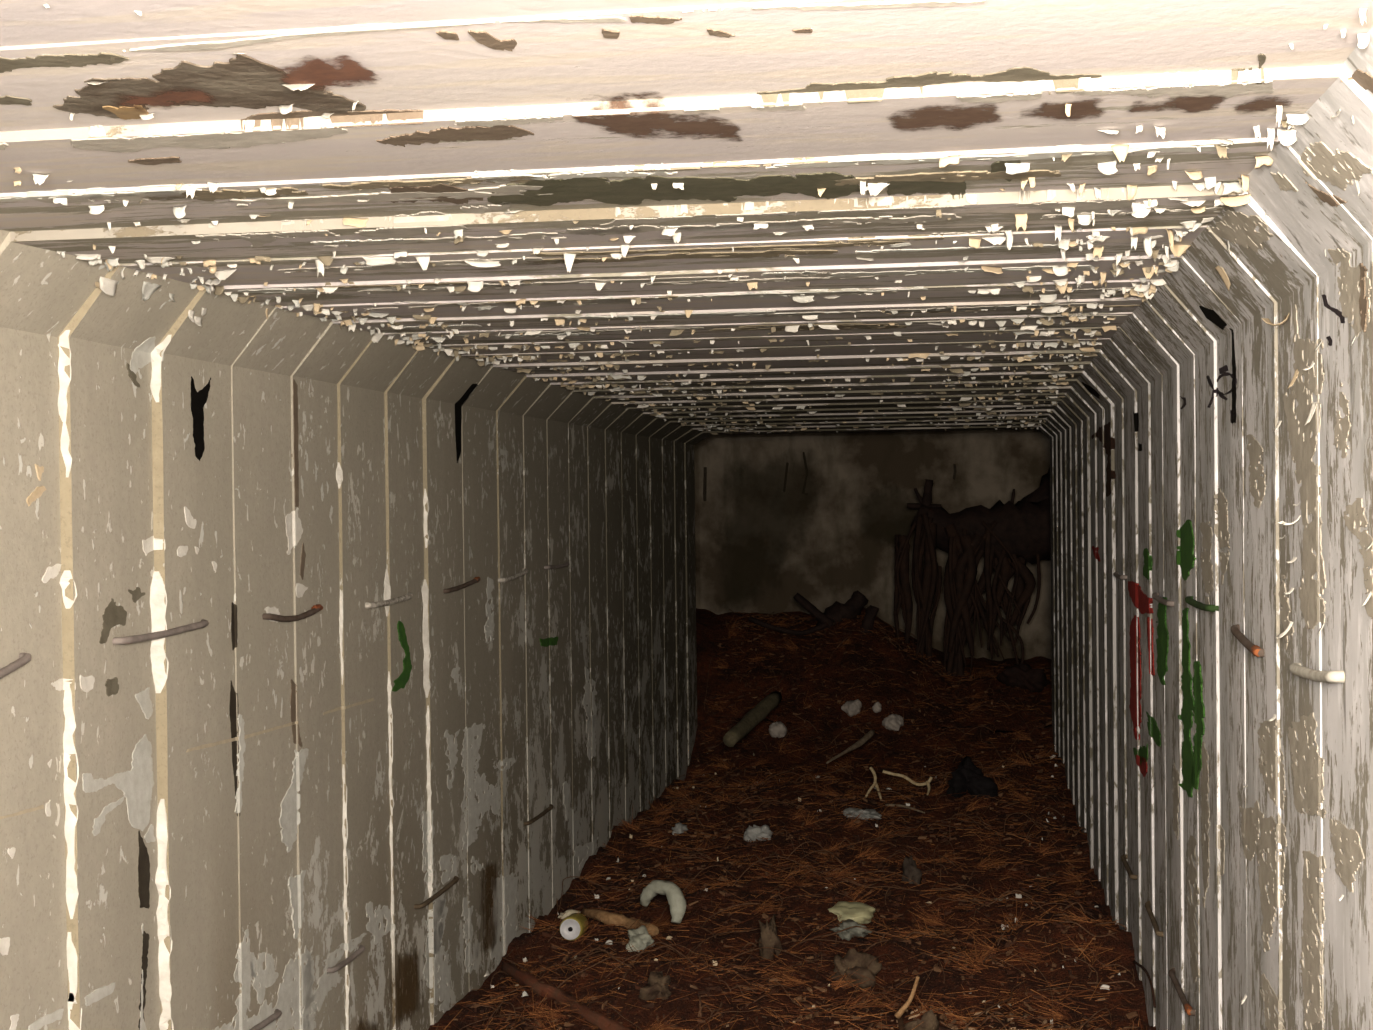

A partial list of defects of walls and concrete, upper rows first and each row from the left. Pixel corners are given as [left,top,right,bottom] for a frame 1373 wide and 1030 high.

corrosion [115,89,217,109]
corrosion [280,55,377,90]
spalling [0,9,724,165]
peeling [0,53,1373,435]
peeling [42,564,77,609]
peeling [58,330,72,477]
peeling [142,536,217,573]
peeling [285,508,303,555]
peeling [1261,304,1351,650]
peeling [9,571,174,1030]
peeling [212,671,396,1030]
peeling [422,577,519,1017]